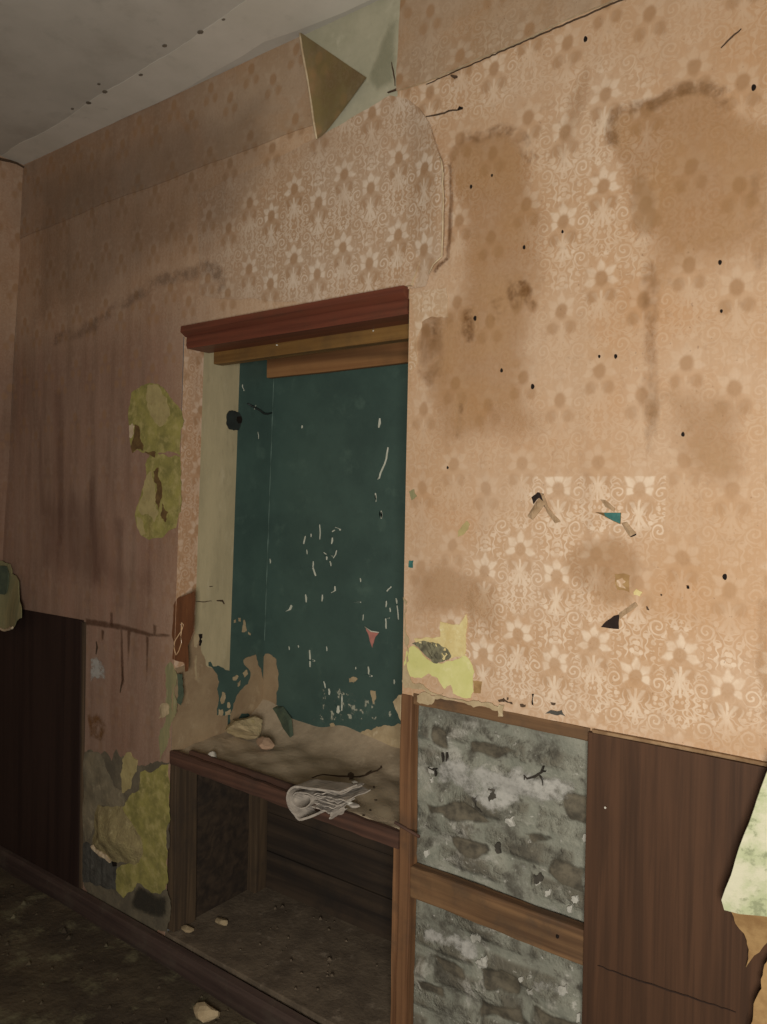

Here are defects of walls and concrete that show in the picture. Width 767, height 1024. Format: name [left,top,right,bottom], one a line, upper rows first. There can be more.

flaking render [305,0,400,132]
crack [387,62,397,93]
peeling [128,383,184,540]
peeling [320,677,401,748]
peeling [404,614,474,698]
flaking render [82,633,279,933]